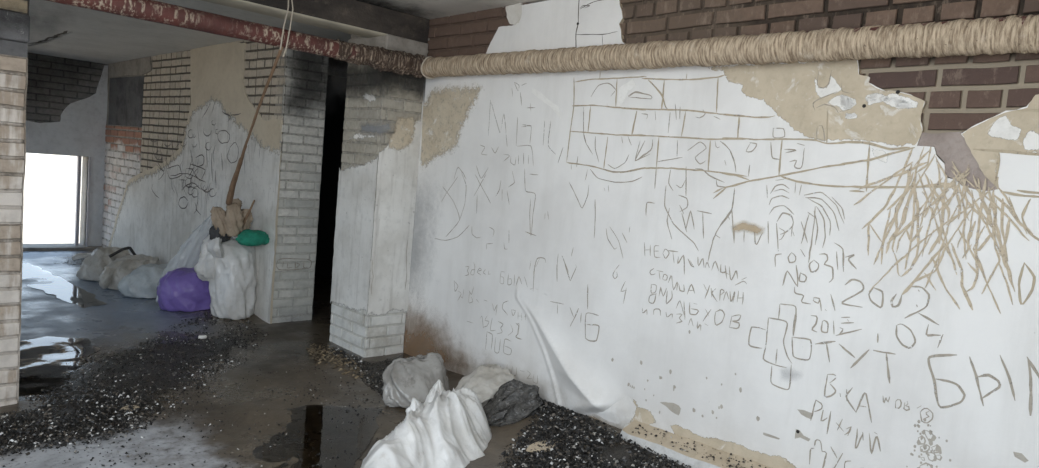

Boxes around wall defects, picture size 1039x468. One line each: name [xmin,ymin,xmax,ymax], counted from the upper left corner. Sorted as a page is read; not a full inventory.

flaking render [620,0,1039,44]
peeling [389,87,480,165]
flaking render [709,53,1039,191]
peeling [628,369,796,468]
flaking render [906,419,951,468]